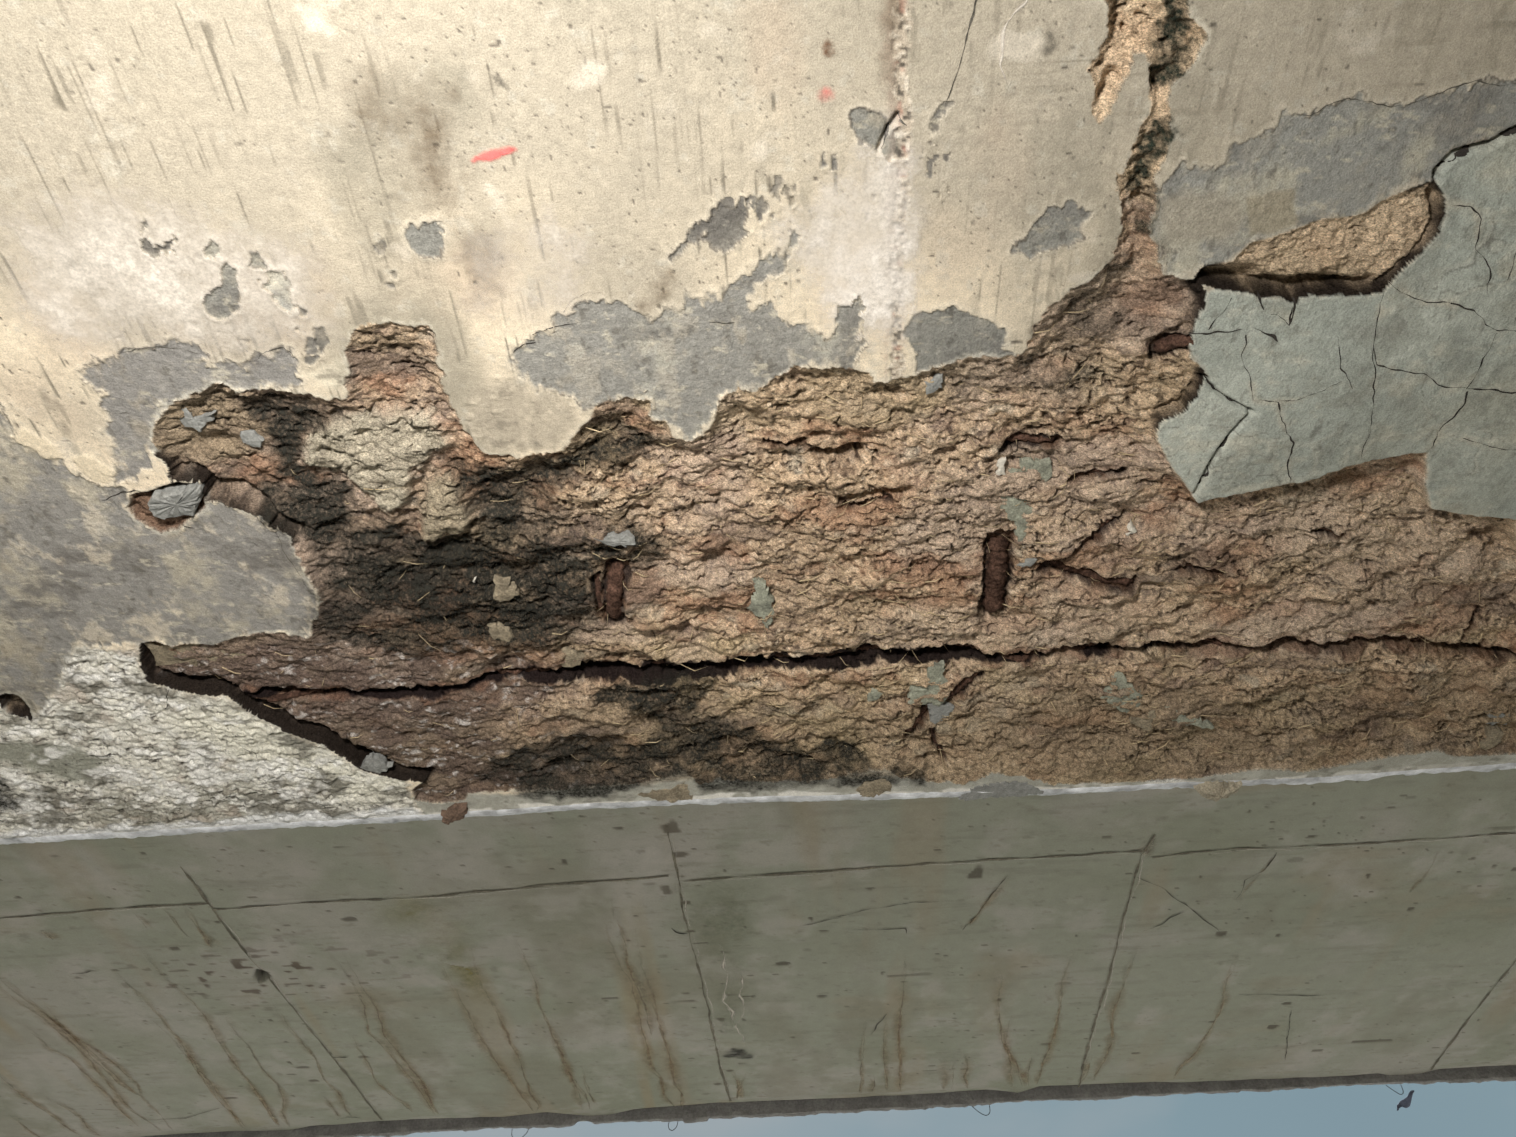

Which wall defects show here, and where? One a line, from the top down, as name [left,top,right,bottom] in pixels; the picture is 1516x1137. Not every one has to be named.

crack [1306,80,1516,116]
leakage [248,393,660,655]
spalling [0,0,1516,825]
crack [1189,126,1516,484]